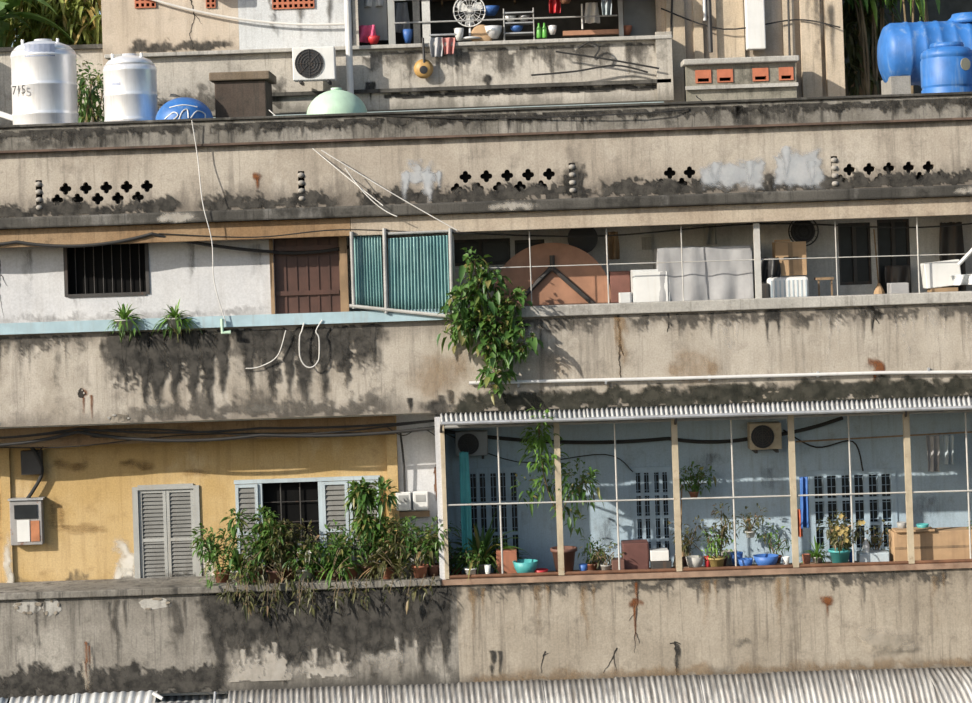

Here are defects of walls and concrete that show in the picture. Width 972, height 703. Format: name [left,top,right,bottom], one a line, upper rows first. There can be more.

leakage [363,43,657,99]
leakage [0,98,972,149]
leakage [99,324,384,422]
crack [616,315,624,378]
leakage [633,307,919,339]
peeling [114,541,135,579]
rust [630,583,643,631]
leakage [0,582,602,698]